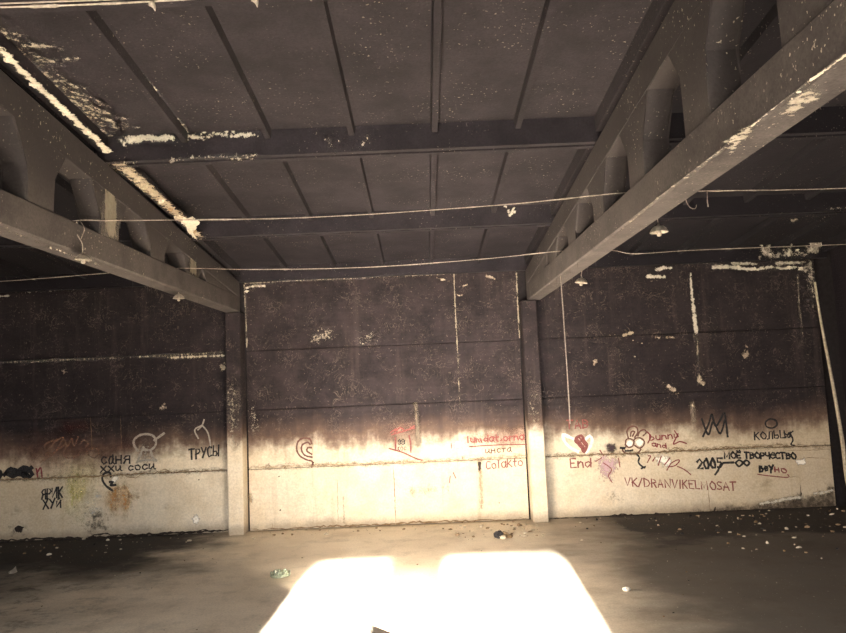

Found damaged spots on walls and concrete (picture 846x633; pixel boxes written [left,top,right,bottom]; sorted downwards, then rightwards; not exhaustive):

damp [0,29,175,153]
damp [177,118,258,141]
peeling [706,54,846,162]
damp [103,189,118,242]
spalling [703,261,805,271]
damp [690,273,698,363]